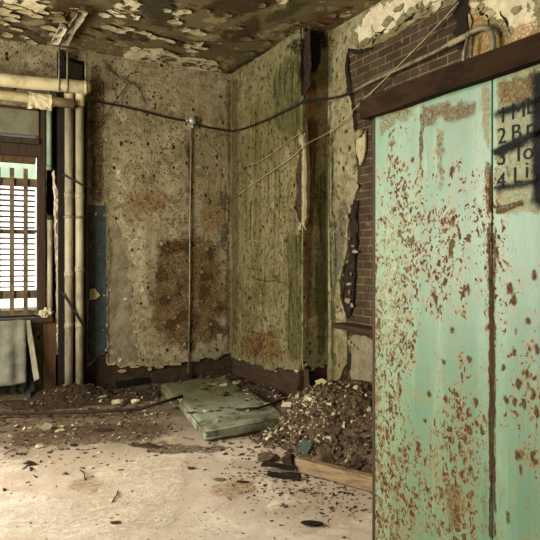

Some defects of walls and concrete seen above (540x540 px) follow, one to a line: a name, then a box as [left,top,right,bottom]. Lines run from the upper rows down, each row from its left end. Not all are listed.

spalling [0,0,88,46]
peeling [99,0,144,20]
peeling [100,9,221,72]
spalling [286,26,334,96]
flaking render [343,129,367,166]
spalling [87,116,327,397]
damp [201,81,241,348]
rust [303,81,318,348]
spalling [332,180,360,318]